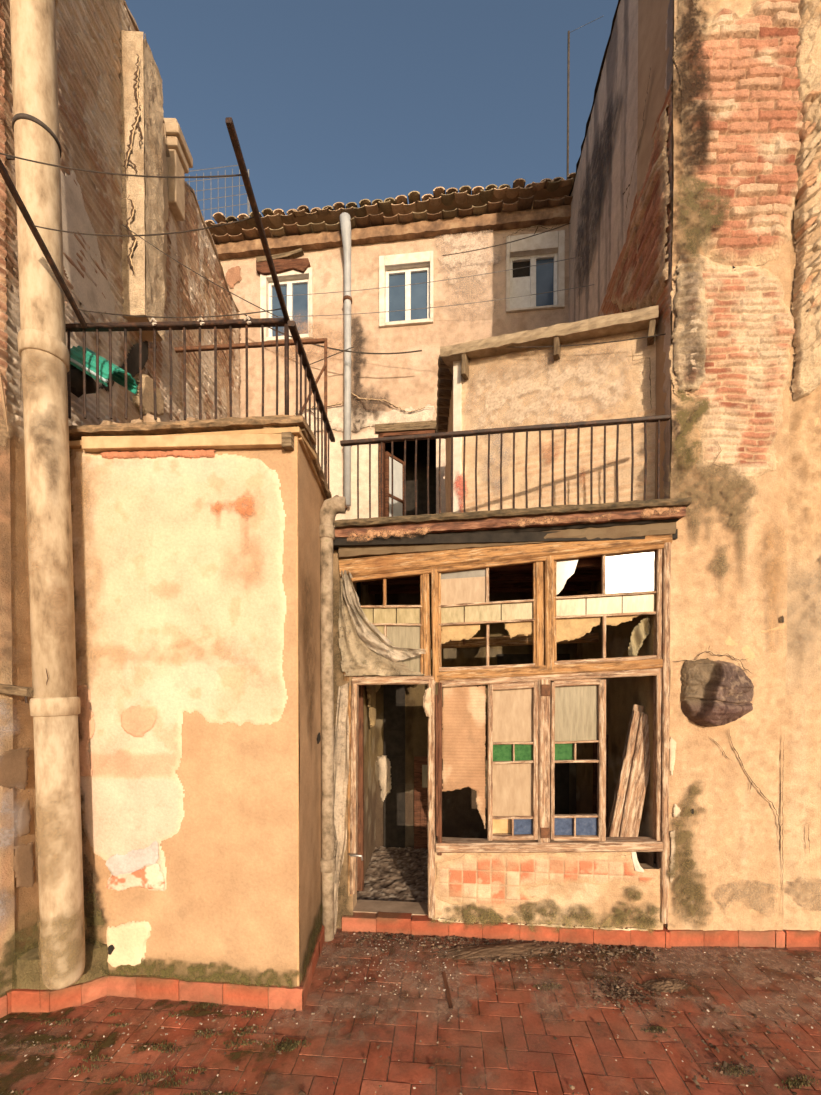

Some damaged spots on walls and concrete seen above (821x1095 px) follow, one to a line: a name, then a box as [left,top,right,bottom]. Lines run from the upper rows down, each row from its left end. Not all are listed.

crack [123,54,143,276]
flaking render [611,0,804,482]
peeling [71,449,288,891]
crack [710,730,811,923]
leakage [37,914,94,982]
flaking render [106,921,151,968]